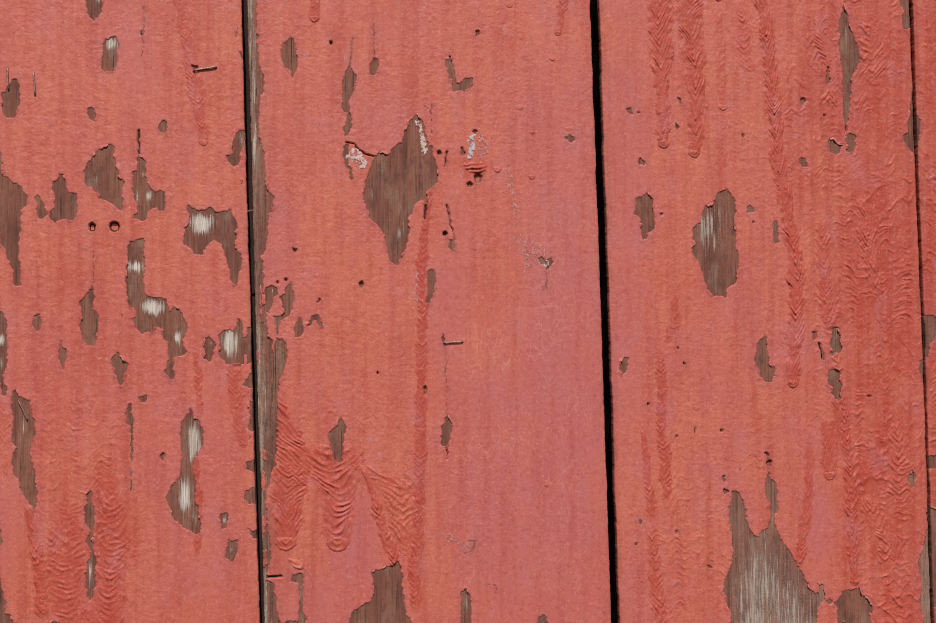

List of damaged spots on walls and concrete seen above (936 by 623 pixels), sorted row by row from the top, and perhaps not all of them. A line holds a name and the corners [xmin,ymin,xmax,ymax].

peeling [828,3,859,155]
peeling [0,153,78,286]
peeling [84,144,165,221]
peeling [123,239,187,380]
peeling [182,206,242,287]
peeling [202,0,325,623]
peeling [363,113,439,265]
peeling [690,190,740,298]
peeling [166,409,204,535]
peeling [349,562,411,623]
peeling [722,473,873,623]
peeling [918,506,936,623]